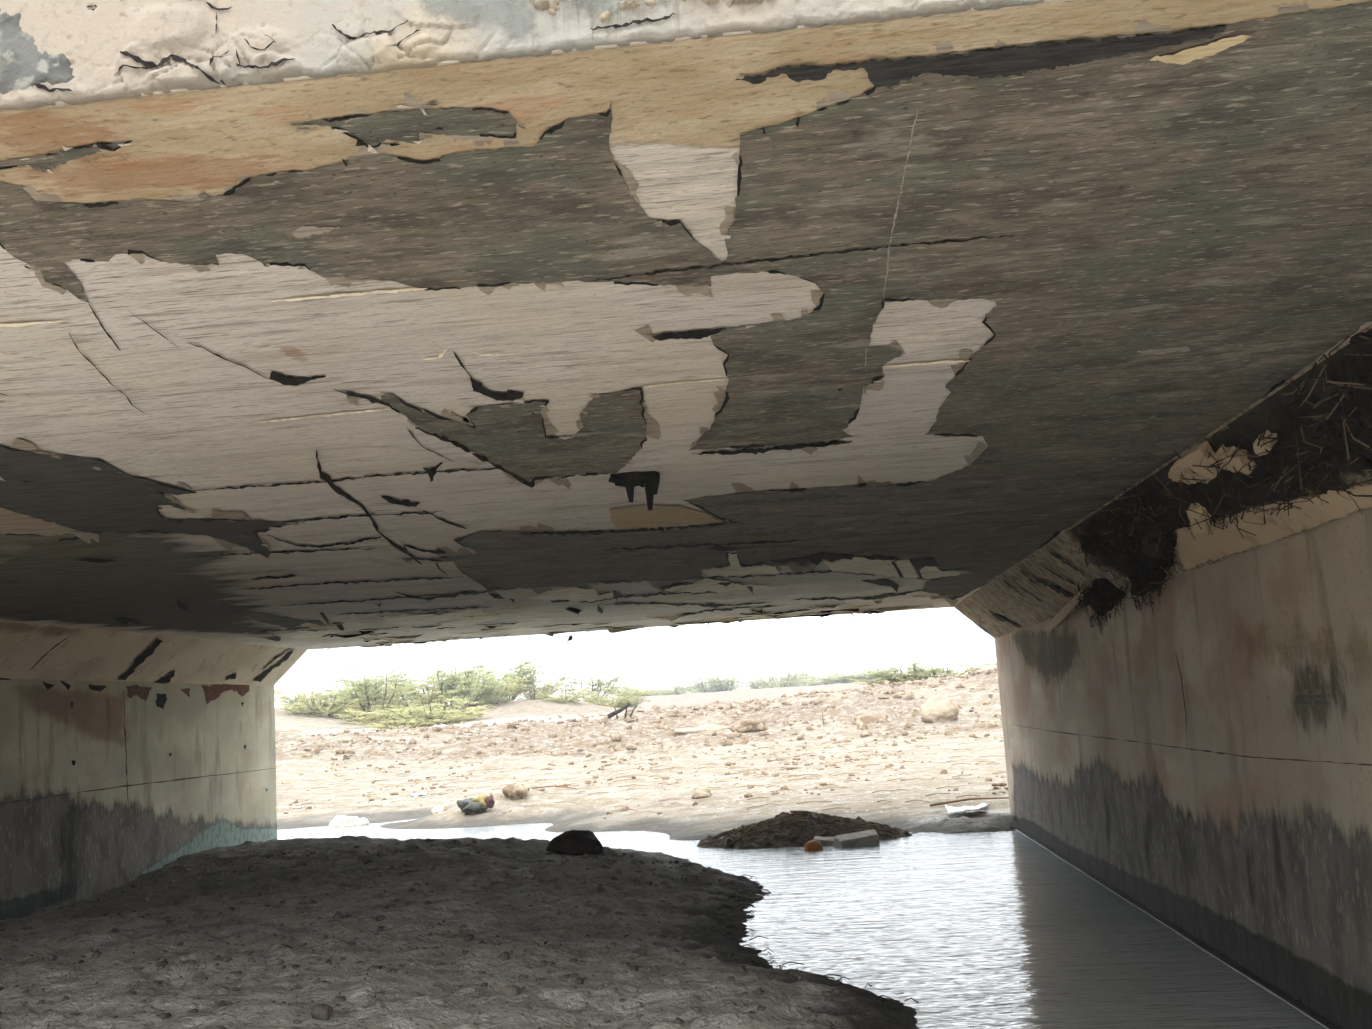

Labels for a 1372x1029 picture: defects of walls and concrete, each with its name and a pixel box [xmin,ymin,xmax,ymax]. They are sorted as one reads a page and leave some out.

peeling [0,0,1372,682]
crack [185,428,519,633]
water stain [0,786,277,915]
water stain [1012,758,1372,995]